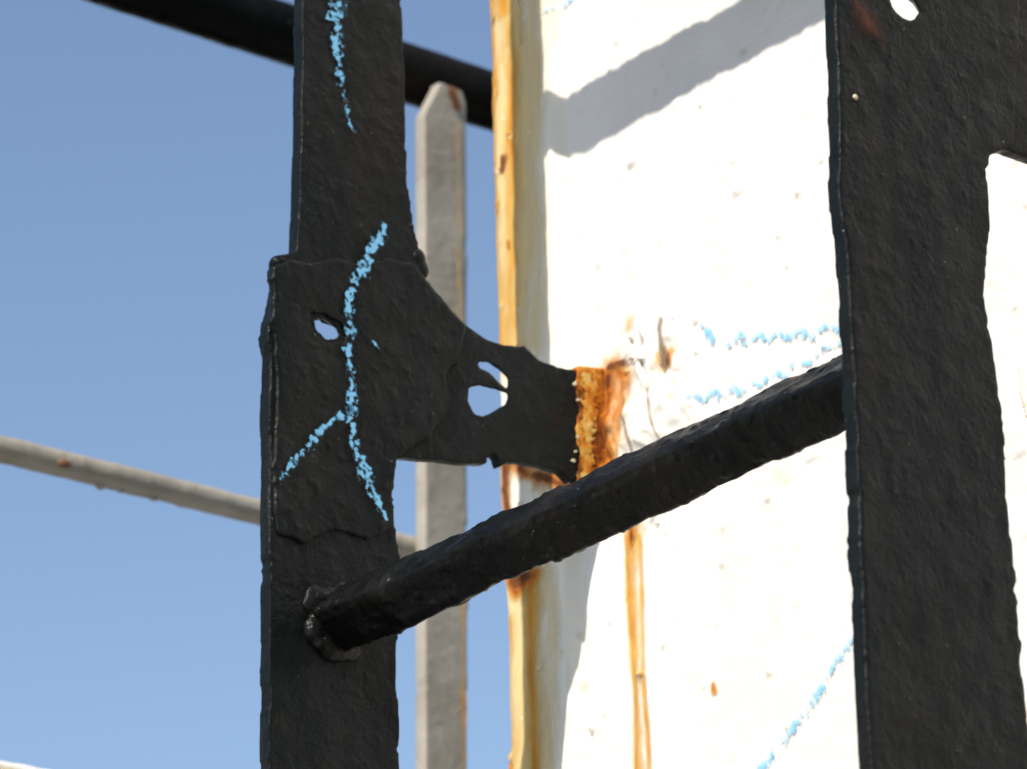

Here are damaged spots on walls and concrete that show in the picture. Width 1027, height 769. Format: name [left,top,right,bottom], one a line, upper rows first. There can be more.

corrosion [490,0,521,346]
corrosion [501,357,630,511]
corrosion [655,316,674,371]
corrosion [505,567,541,769]
corrosion [625,526,650,769]